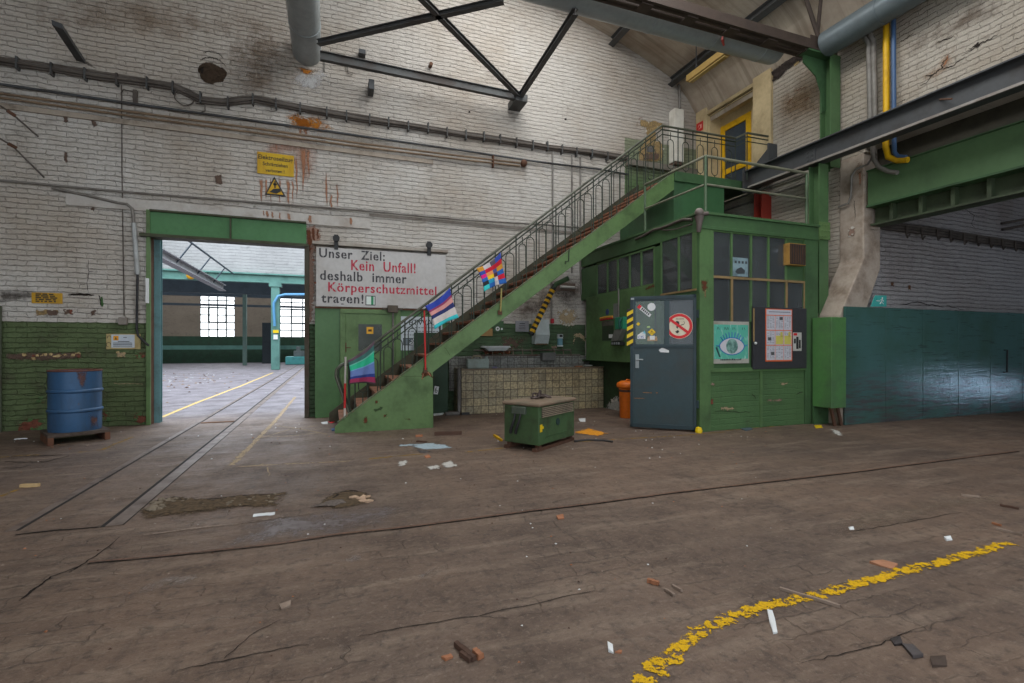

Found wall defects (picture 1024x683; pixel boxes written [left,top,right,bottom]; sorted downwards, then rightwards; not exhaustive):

spalling [198,50,227,84]
crack [920,35,997,86]
corrosion [288,115,328,134]
corrosion [260,144,309,219]
peeling [333,490,374,503]
crack [18,537,119,601]